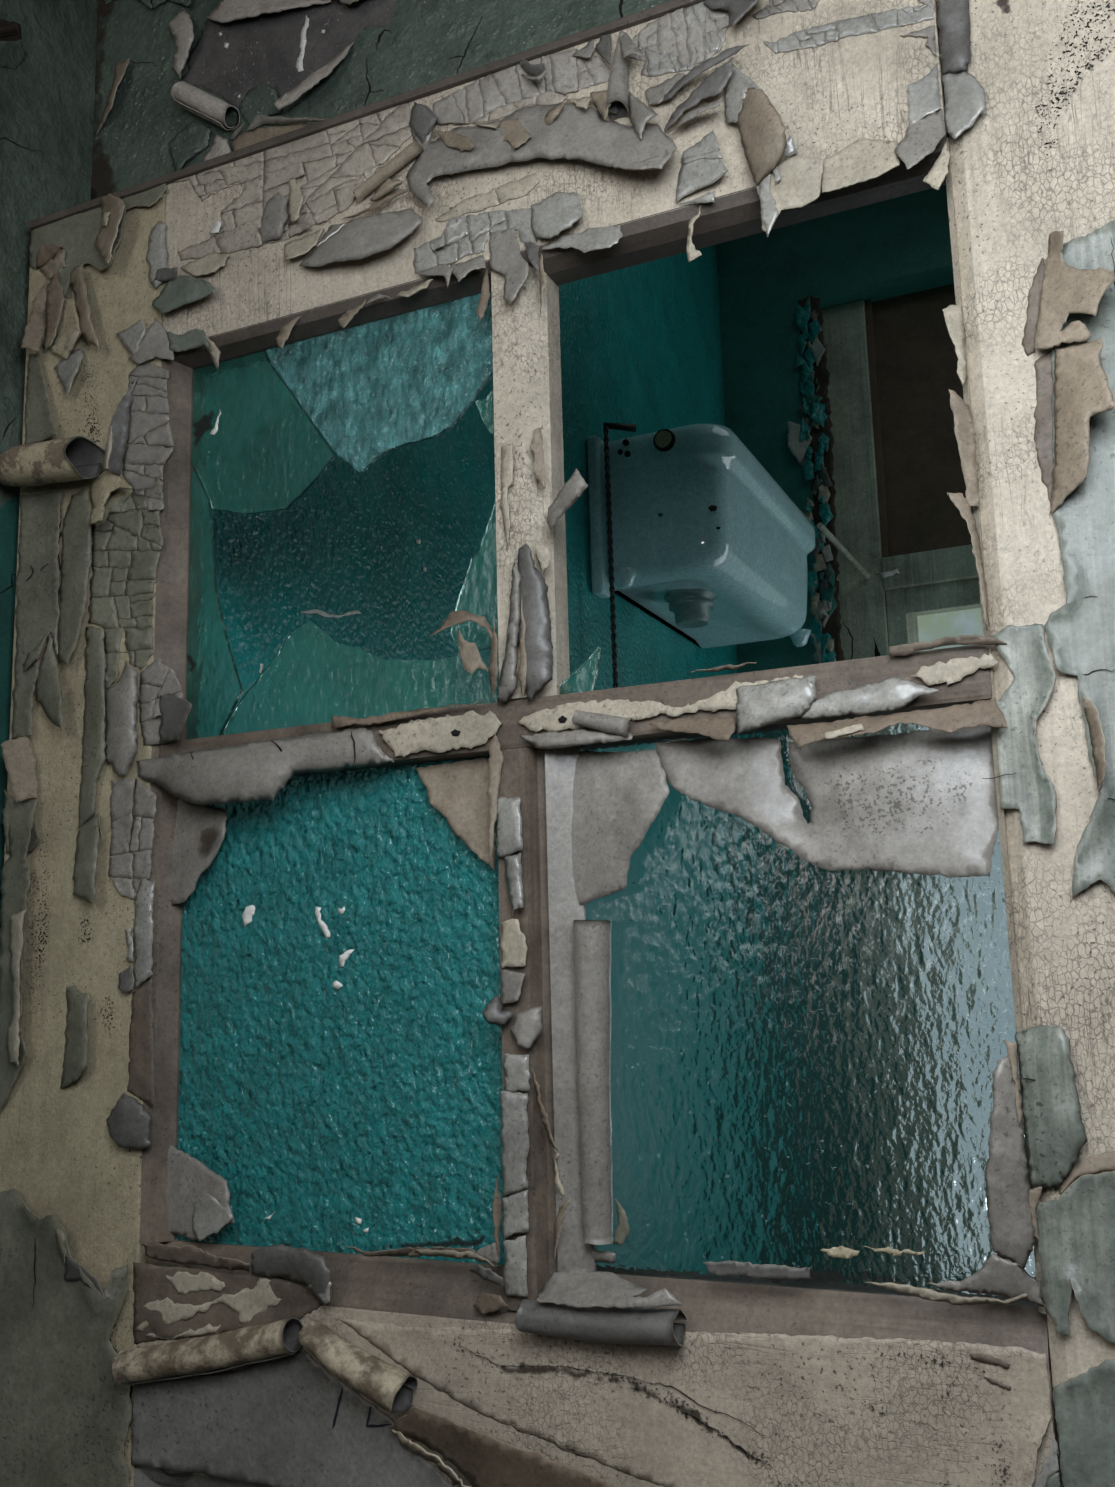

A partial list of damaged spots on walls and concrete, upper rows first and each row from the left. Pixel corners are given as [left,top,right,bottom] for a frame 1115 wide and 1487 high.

spalling [140,0,396,171]
crack [174,0,941,276]
peeling [284,0,951,328]
peeling [275,316,300,349]
peeling [0,183,221,1112]
peeling [516,220,1115,905]
peeling [0,543,1115,1487]
crack [157,1468,193,1478]
crack [425,1333,820,1487]
crack [852,1348,1011,1403]
crack [991,1438,1011,1487]
crack [1053,1387,1062,1487]